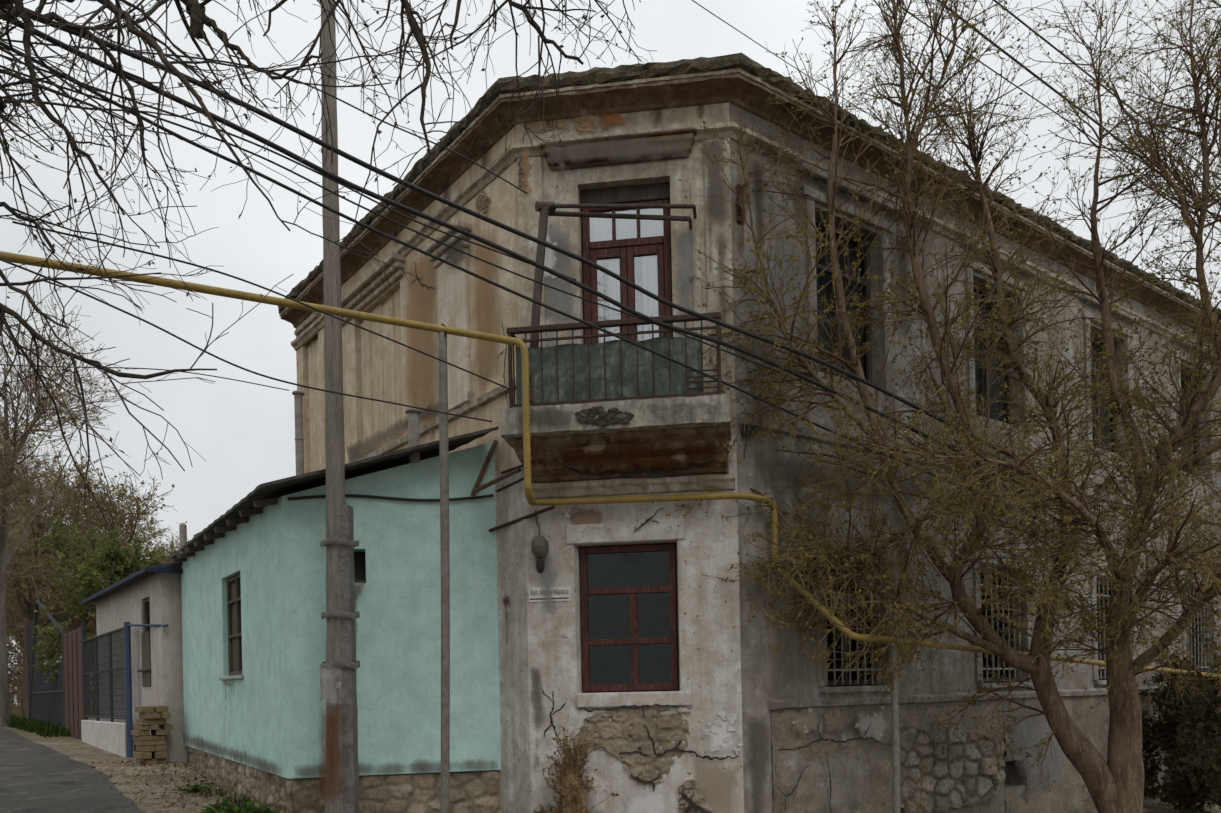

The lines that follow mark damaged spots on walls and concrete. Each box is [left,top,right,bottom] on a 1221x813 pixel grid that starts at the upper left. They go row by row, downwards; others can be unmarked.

crack [554,459,717,477]
crack [634,508,664,532]
crack [542,689,739,813]
spalling [570,707,744,813]
crack [777,711,892,813]
spalling [854,706,1006,813]